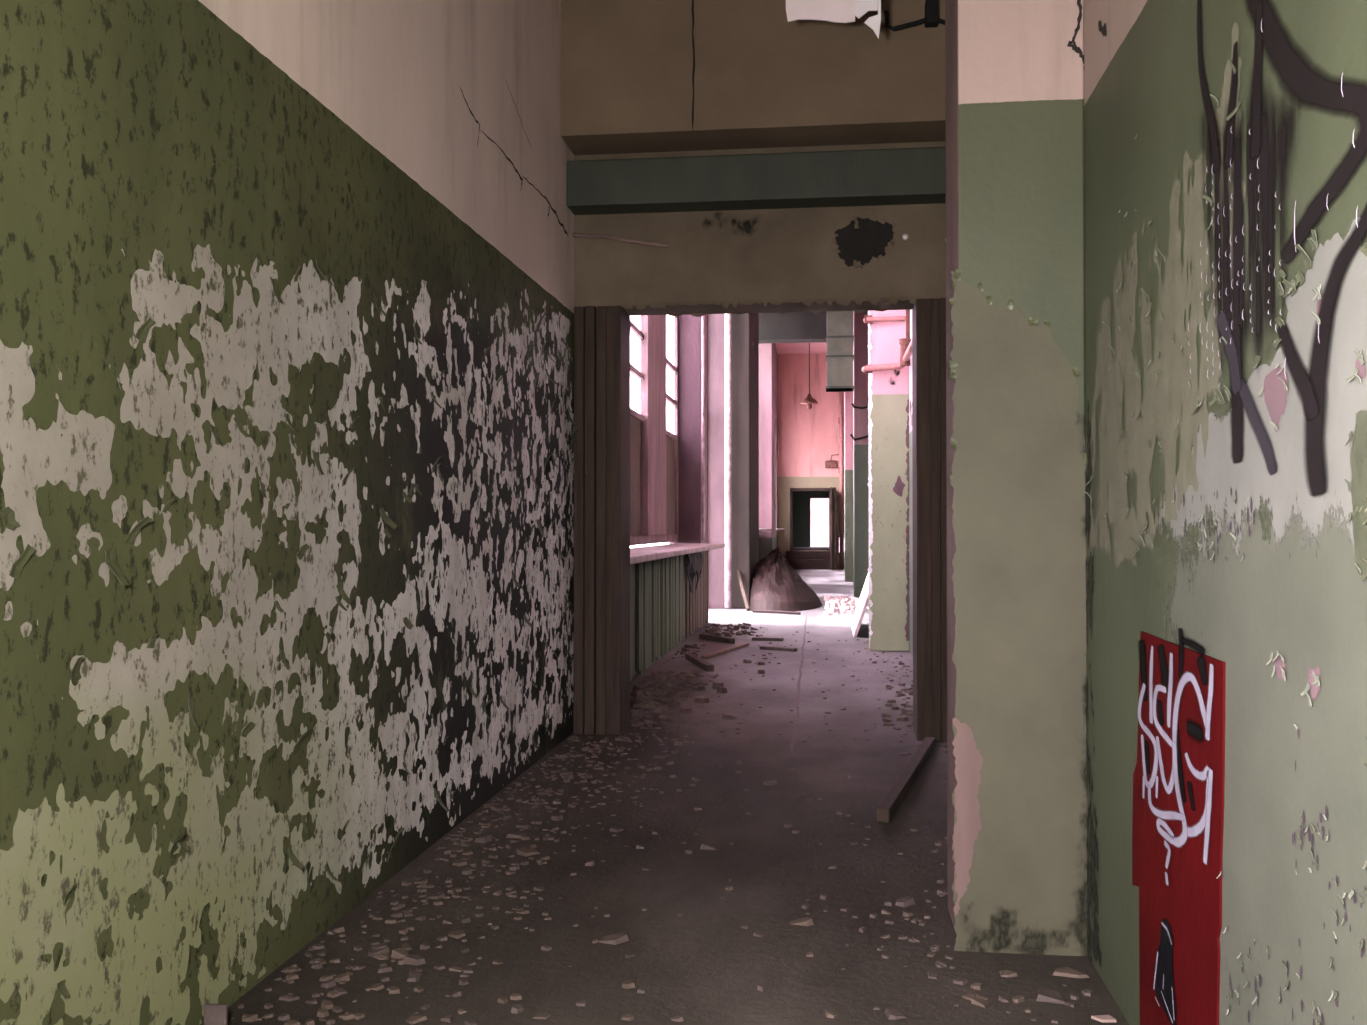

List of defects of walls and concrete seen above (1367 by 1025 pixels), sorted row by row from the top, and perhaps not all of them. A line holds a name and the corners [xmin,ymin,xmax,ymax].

crack [1067,0,1084,64]
peeling [0,244,579,1025]
peeling [949,21,1367,1025]